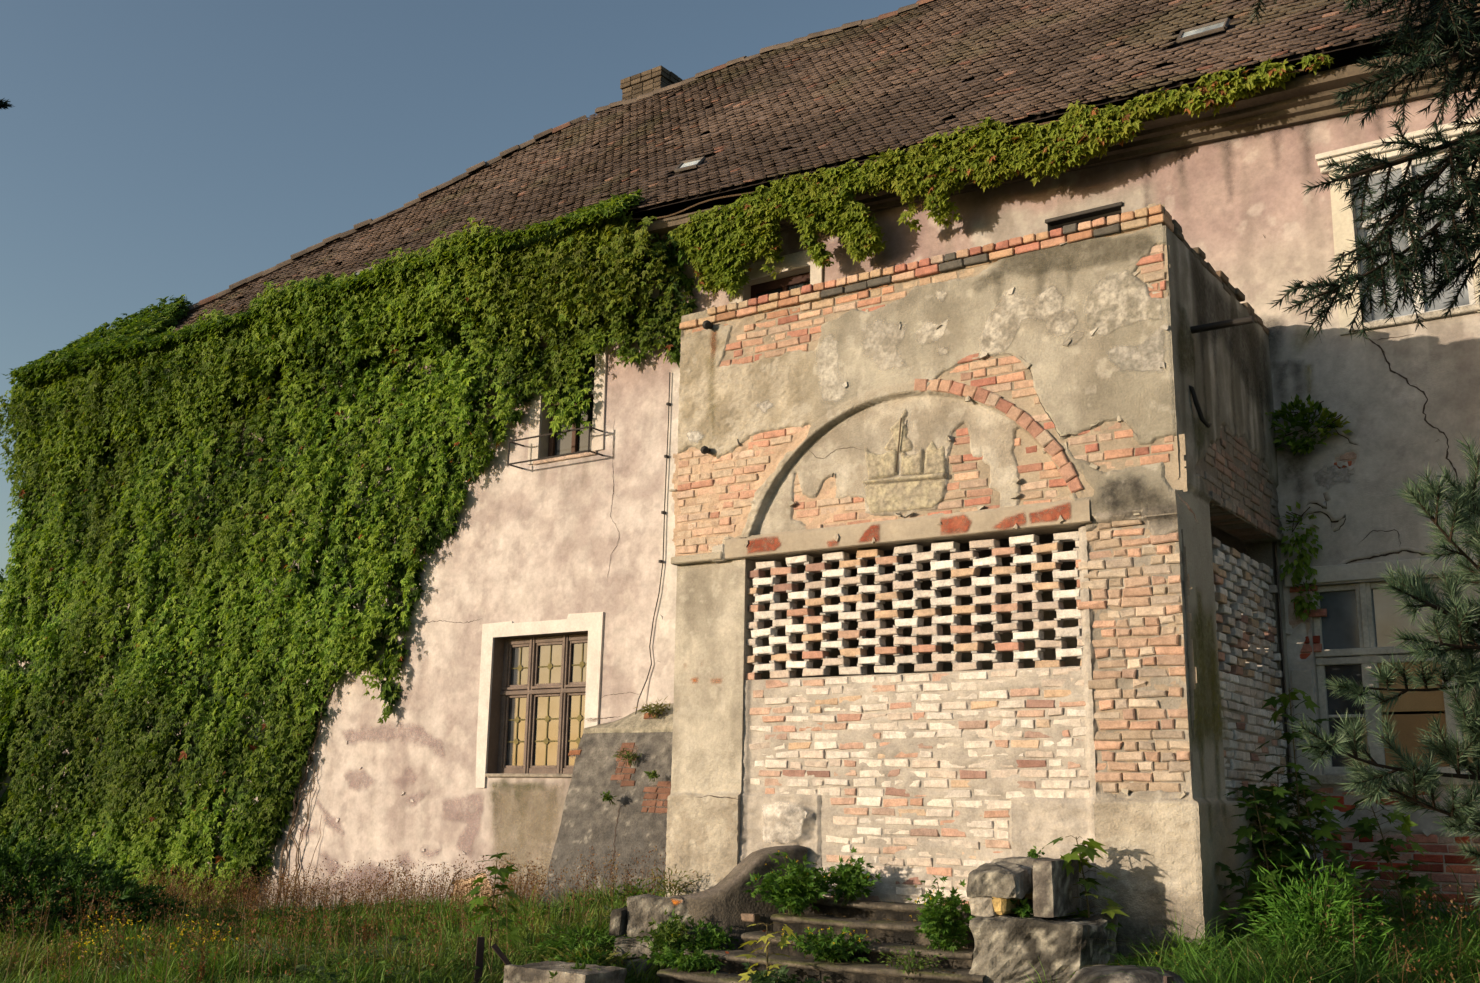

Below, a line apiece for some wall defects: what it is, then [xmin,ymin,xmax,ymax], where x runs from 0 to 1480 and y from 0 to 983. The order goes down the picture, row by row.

flaking render [684,203,1187,546]
crack [1365,334,1457,478]
flaking render [669,425,811,557]
flaking render [610,742,671,814]
flaking render [1299,787,1480,912]